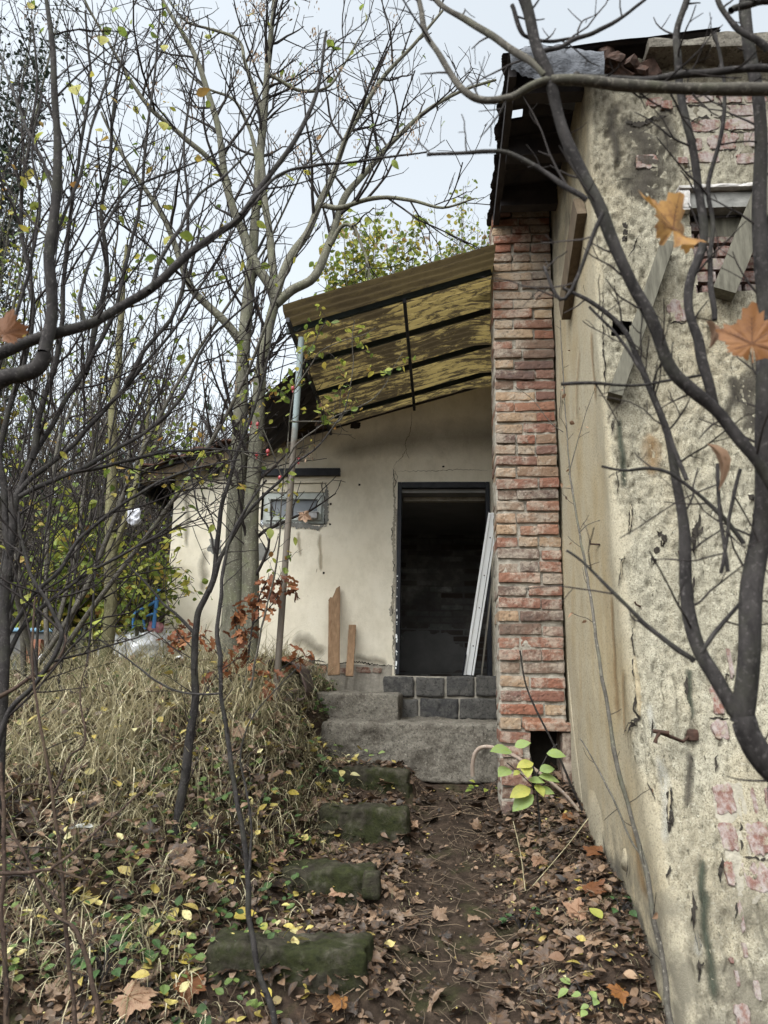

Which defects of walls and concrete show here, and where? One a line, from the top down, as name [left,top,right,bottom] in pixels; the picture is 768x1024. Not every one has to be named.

flaking render [633,154,658,170]
flaking render [645,95,754,170]
flaking render [712,782,768,1024]